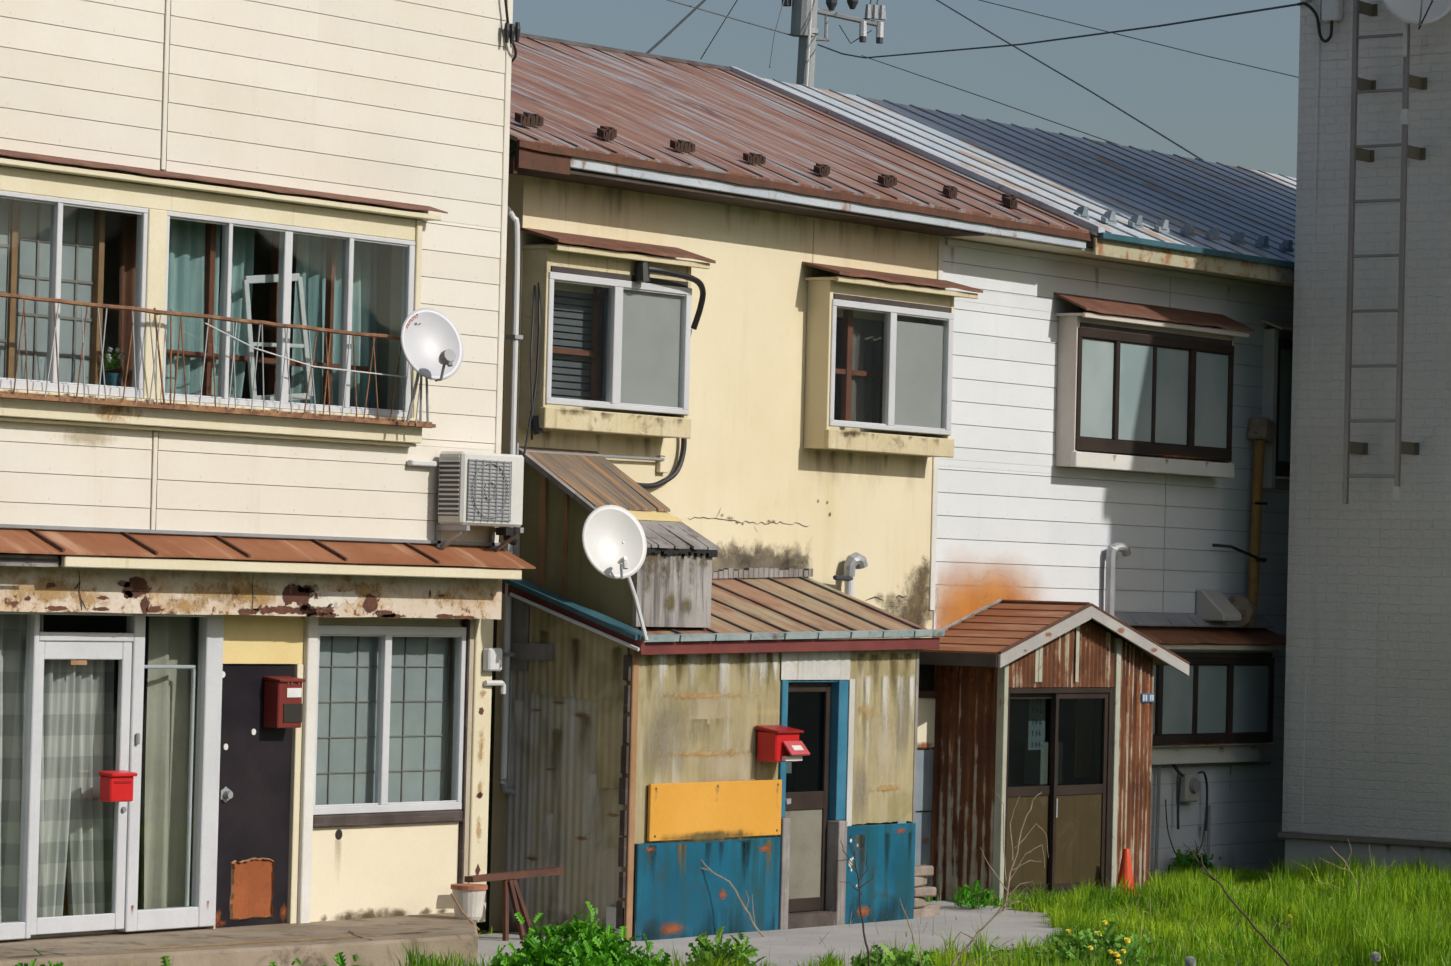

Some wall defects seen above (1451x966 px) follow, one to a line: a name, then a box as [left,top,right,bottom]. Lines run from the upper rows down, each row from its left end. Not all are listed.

crack [687,508,808,532]
leakage [645,553,680,580]
leakage [702,546,808,572]
peeling [25,596,68,611]
peeling [93,576,165,614]
peeling [238,583,406,619]
peeling [429,590,476,619]
leakage [667,597,689,610]
leakage [877,565,930,638]
rust [938,574,1025,631]
rust [663,924,680,934]